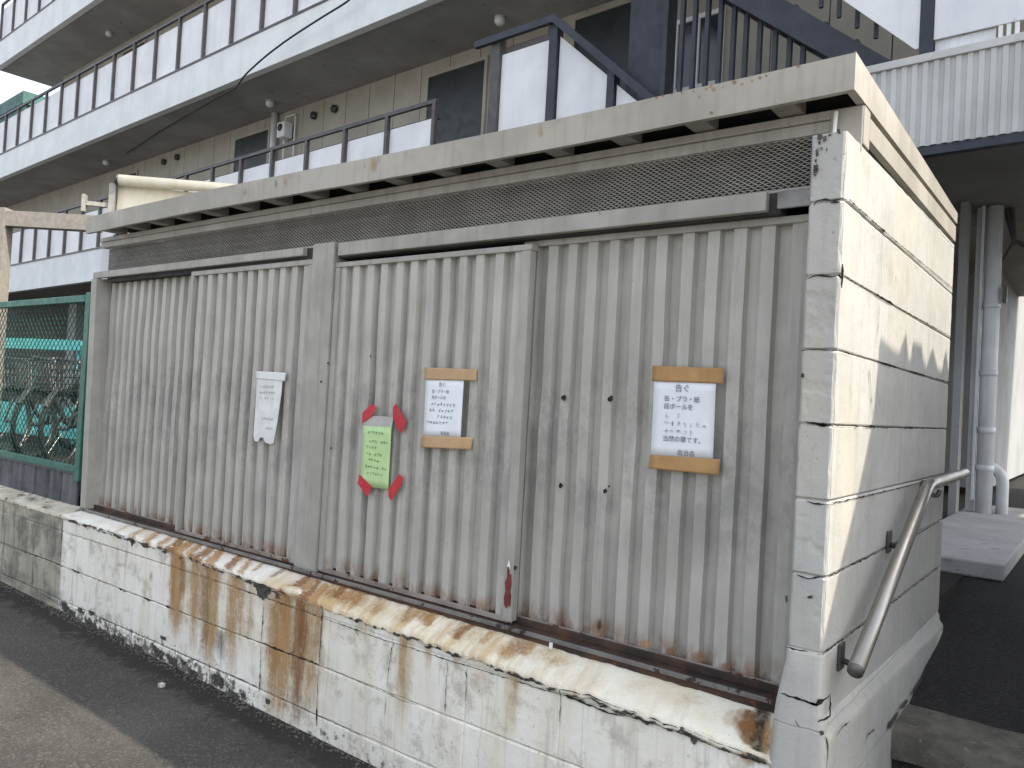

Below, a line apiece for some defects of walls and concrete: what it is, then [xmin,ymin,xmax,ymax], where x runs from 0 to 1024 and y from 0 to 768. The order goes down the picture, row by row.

peeling [813,129,841,176]
crack [808,198,953,336]
rust [133,529,262,655]
rust [269,576,362,706]
rust [737,708,769,761]
crack [781,693,875,740]